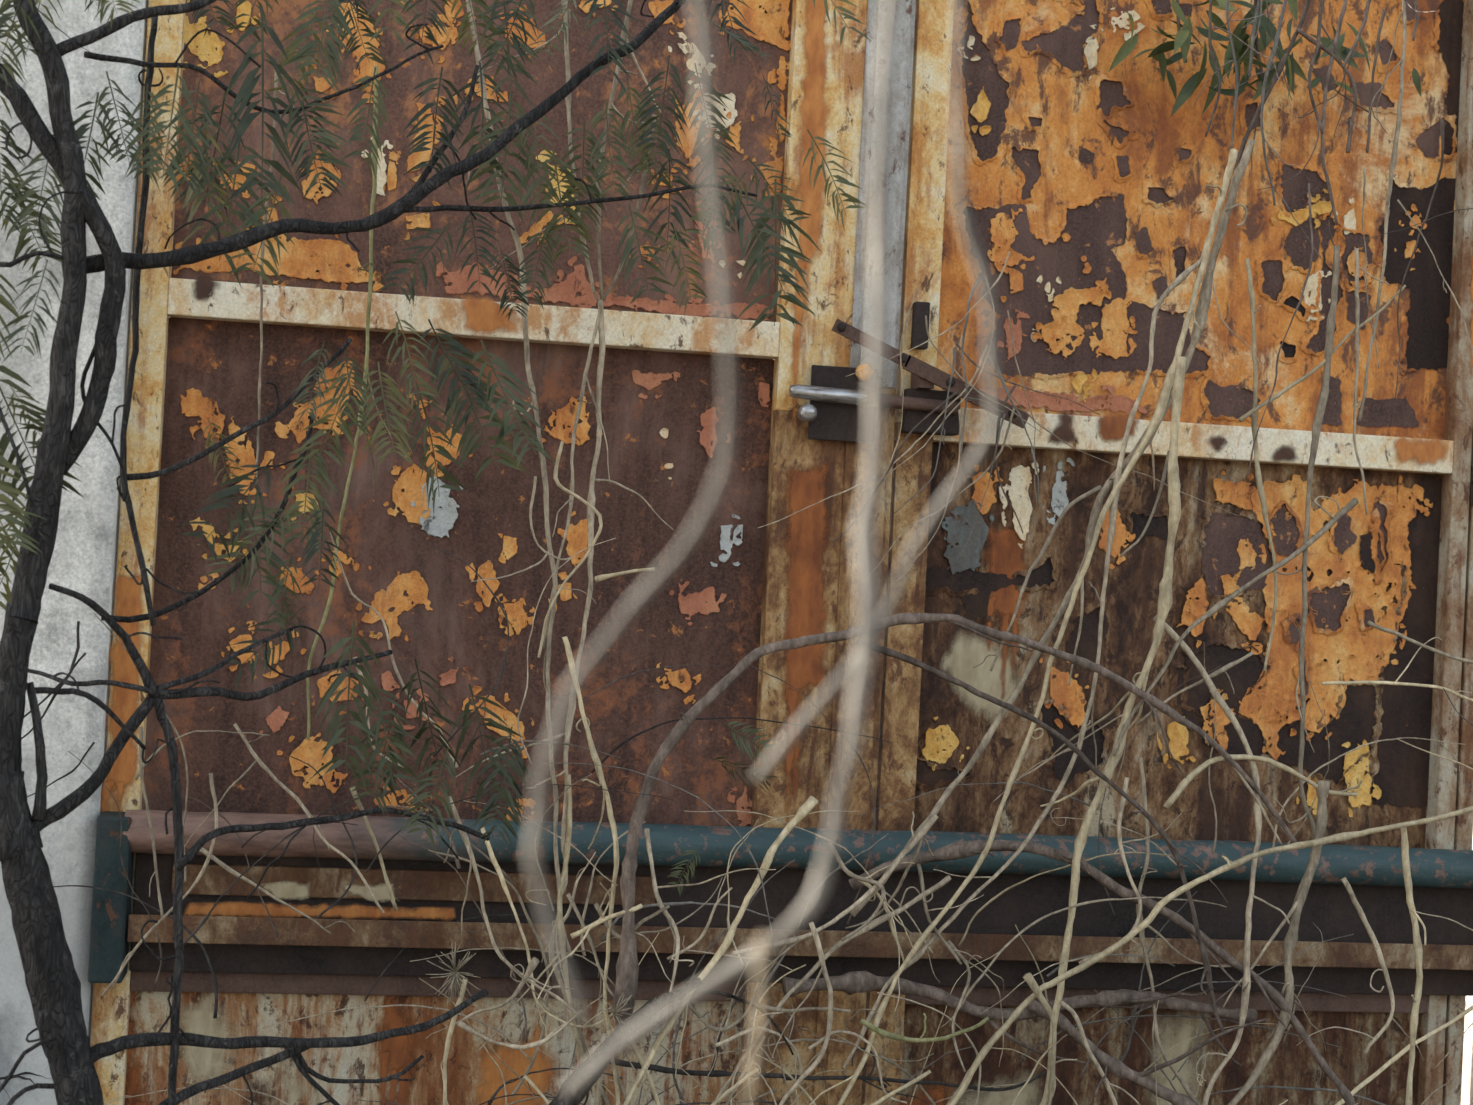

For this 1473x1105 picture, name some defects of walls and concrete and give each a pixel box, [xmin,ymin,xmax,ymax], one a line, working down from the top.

peeling [648,0,791,199]
rust [792,0,828,417]
peeling [957,0,1265,422]
peeling [1255,0,1465,428]
peeling [383,393,473,538]
peeling [925,458,1075,624]
rust [101,574,142,813]
peeling [1157,470,1444,817]
rust [125,991,147,1105]
rust [182,997,227,1080]
rust [377,996,414,1105]
rust [476,1028,556,1105]